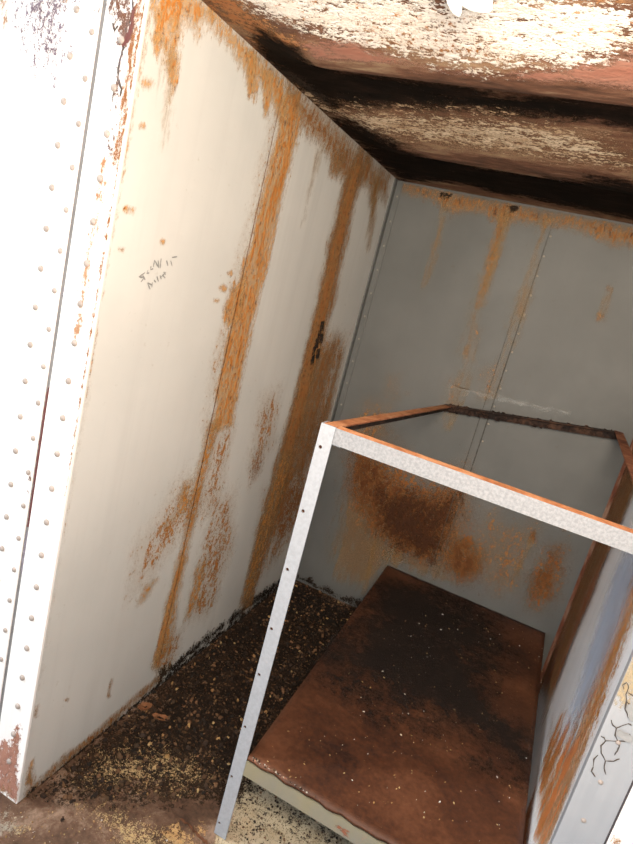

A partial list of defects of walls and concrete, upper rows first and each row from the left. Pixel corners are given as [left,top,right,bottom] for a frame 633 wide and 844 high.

rust [509,51,633,90]
rust [25,0,414,844]
rust [605,468,633,525]
rust [539,541,611,705]
peeling [0,724,21,803]
rust [523,577,633,844]